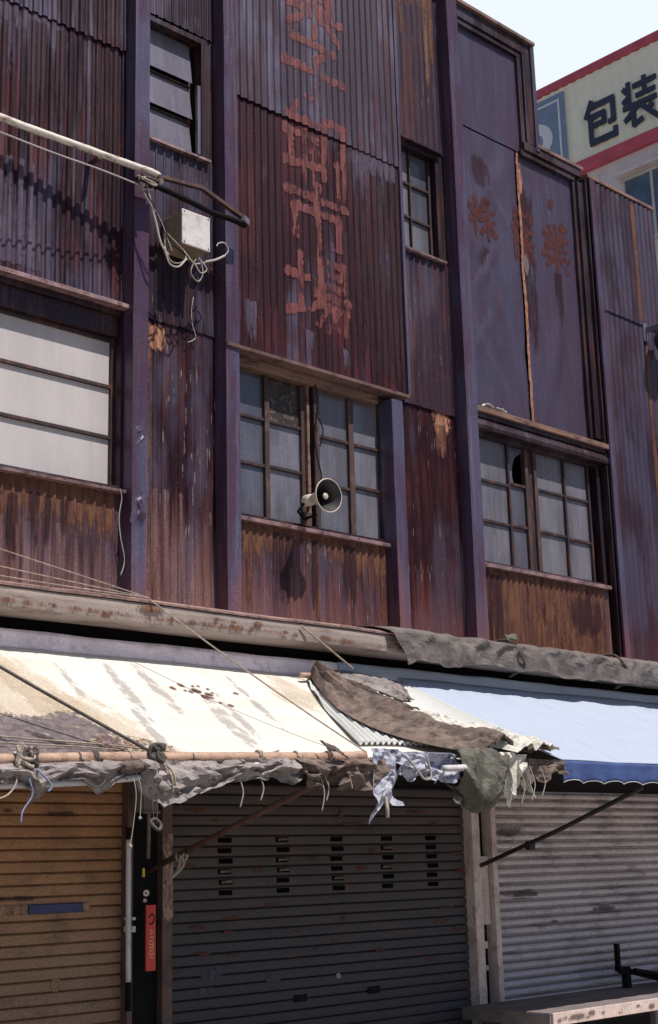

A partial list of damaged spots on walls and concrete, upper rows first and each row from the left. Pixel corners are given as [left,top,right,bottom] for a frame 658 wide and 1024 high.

rust [26,19,66,137]
rust [91,42,119,187]
rust [0,472,114,588]
rust [70,321,298,637]
rust [241,521,386,626]
rust [431,410,451,458]
rust [486,568,609,657]